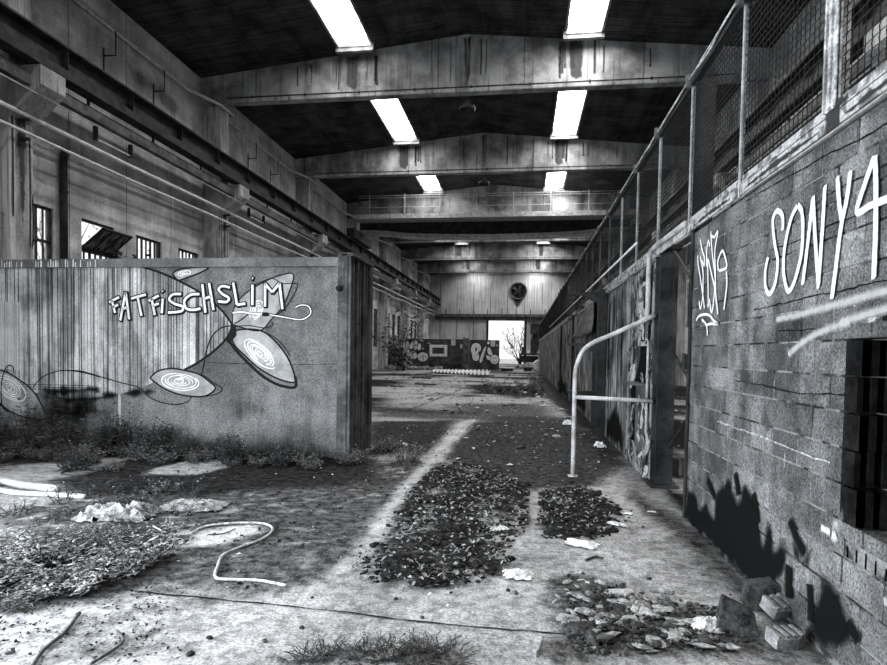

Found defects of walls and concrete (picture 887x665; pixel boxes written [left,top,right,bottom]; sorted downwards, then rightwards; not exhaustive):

water stain [336,56,378,90]
water stain [464,37,487,81]
water stain [400,146,421,169]
water stain [547,140,568,165]